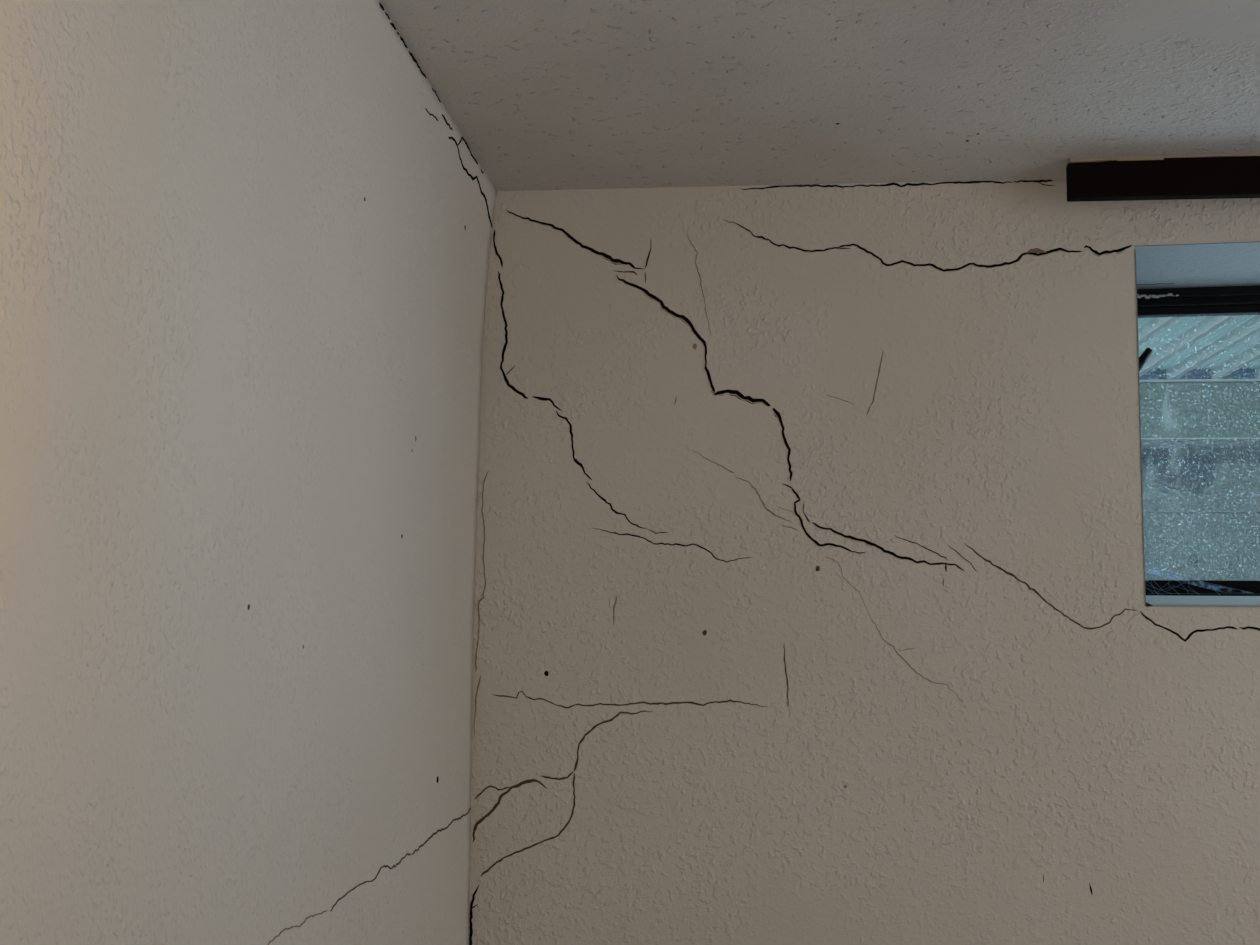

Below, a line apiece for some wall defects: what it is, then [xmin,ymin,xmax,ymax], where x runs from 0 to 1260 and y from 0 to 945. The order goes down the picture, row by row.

crack [379,2,1260,700]
crack [268,471,789,945]